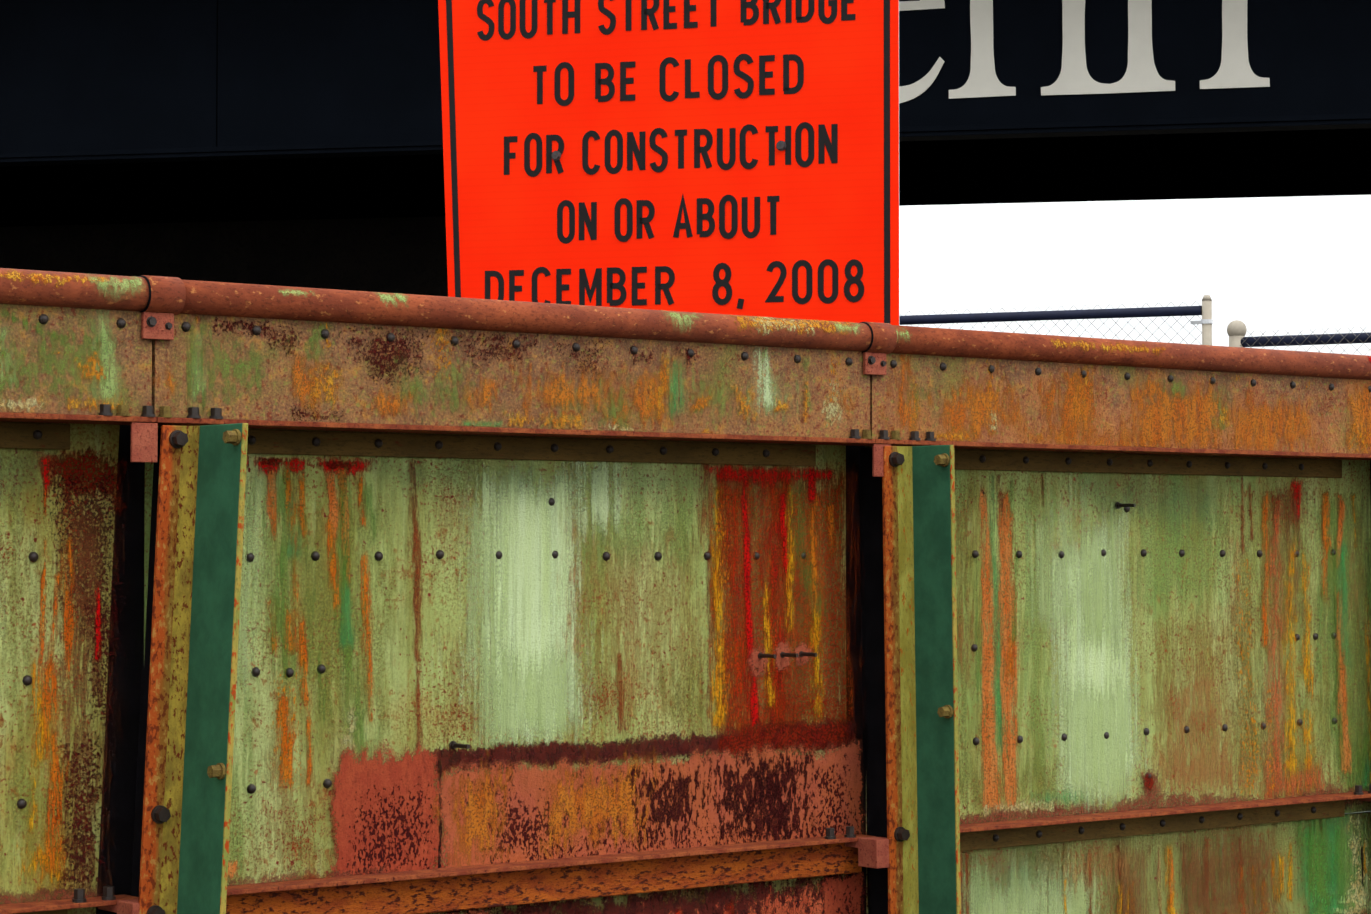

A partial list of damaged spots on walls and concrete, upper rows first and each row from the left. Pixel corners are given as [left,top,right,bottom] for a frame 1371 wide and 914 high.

rust [371,328,497,416]
rust [514,355,681,430]
rust [928,339,1322,451]
rust [1346,385,1371,453]
rust [14,446,127,891]
rust [698,464,859,737]
rust [978,476,1019,811]
rust [1231,476,1371,799]